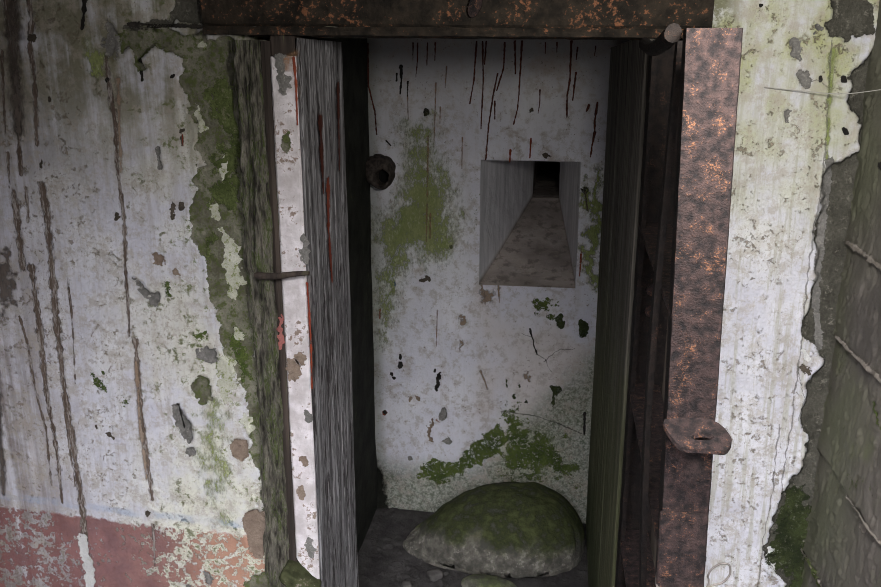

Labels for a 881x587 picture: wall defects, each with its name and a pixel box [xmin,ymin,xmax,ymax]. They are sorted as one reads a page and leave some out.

flaking render [813,0,875,42]
corrosion [469,40,523,160]
corrosion [566,40,579,118]
corrosion [586,102,598,157]
flaking render [789,37,823,89]
flaking render [101,0,266,559]
flaking render [763,55,870,587]
flaking render [243,572,268,587]